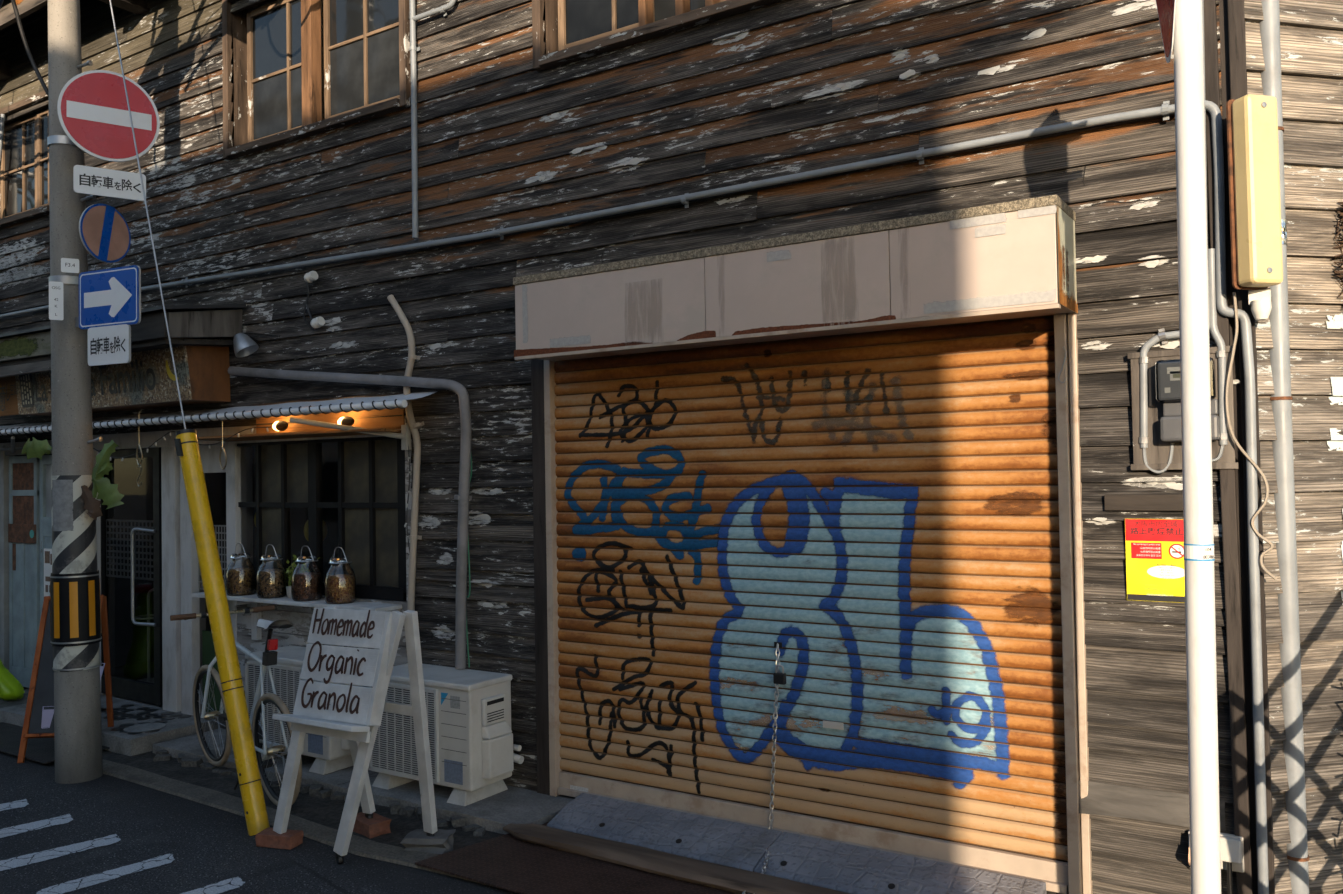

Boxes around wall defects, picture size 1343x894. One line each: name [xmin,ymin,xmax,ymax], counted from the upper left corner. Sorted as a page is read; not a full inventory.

peeling [1110,0,1157,16]
peeling [1021,28,1047,40]
peeling [890,48,939,80]
peeling [978,63,1018,75]
peeling [802,79,867,101]
peeling [569,142,649,173]
peeling [0,237,50,289]
peeling [1326,315,1343,329]
peeling [1329,377,1343,405]
peeling [1327,428,1343,451]
corrosion [984,492,1044,516]
corrosion [1004,588,1061,624]